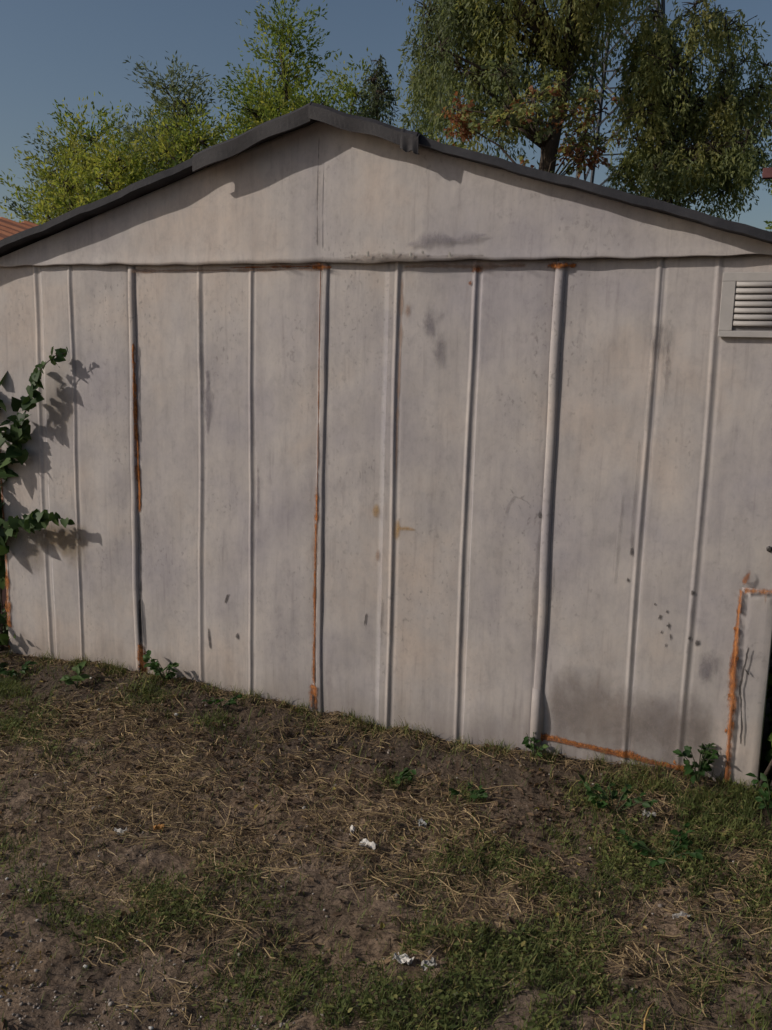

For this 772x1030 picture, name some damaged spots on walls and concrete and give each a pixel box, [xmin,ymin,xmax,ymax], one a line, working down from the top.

corrosion [132,344,141,512]
corrosion [137,645,147,673]
corrosion [310,443,318,710]
corrosion [540,733,684,771]
corrosion [724,573,772,783]